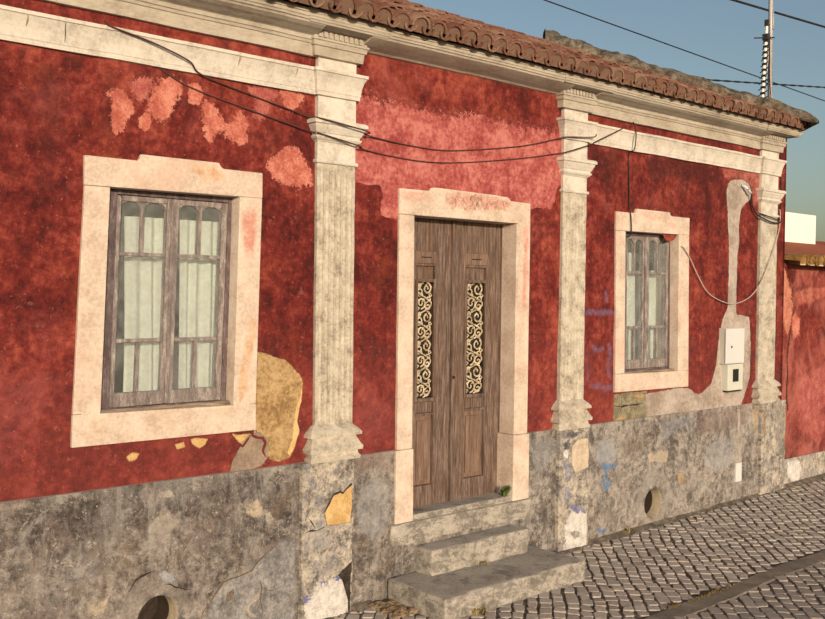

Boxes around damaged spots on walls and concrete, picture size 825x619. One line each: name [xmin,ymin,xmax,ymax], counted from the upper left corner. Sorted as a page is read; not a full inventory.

peeling [106,73,305,146]
peeling [266,145,315,192]
peeling [118,443,147,470]
peeling [166,434,215,457]
flaking render [226,344,309,472]
peeling [529,430,589,551]
peeling [613,391,694,469]
crack [123,570,188,603]
crack [201,541,282,619]
peeling [190,477,396,619]